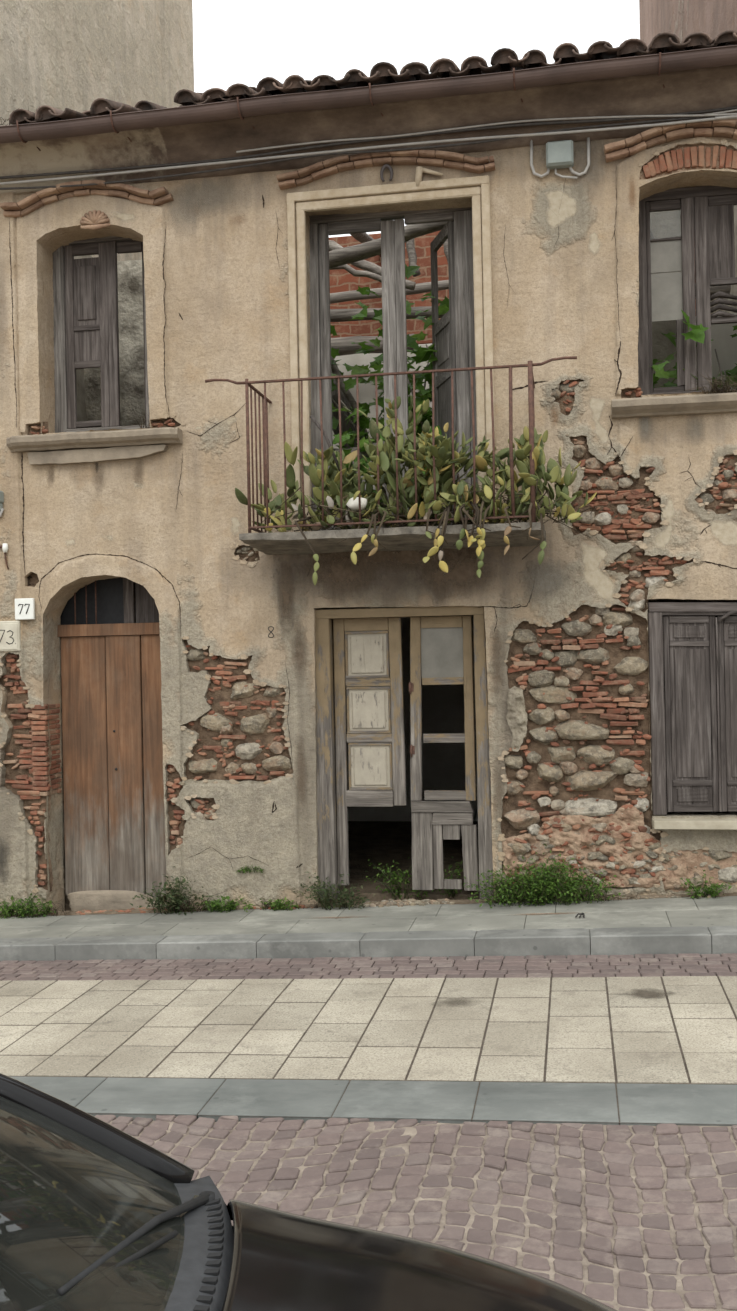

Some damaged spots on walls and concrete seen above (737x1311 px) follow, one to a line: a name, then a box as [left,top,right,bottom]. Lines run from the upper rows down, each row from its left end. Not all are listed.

flaking render [546,191,577,227]
spalling [497,376,737,895]
crack [680,520,737,569]
spalling [0,651,62,893]
spalling [163,636,293,853]